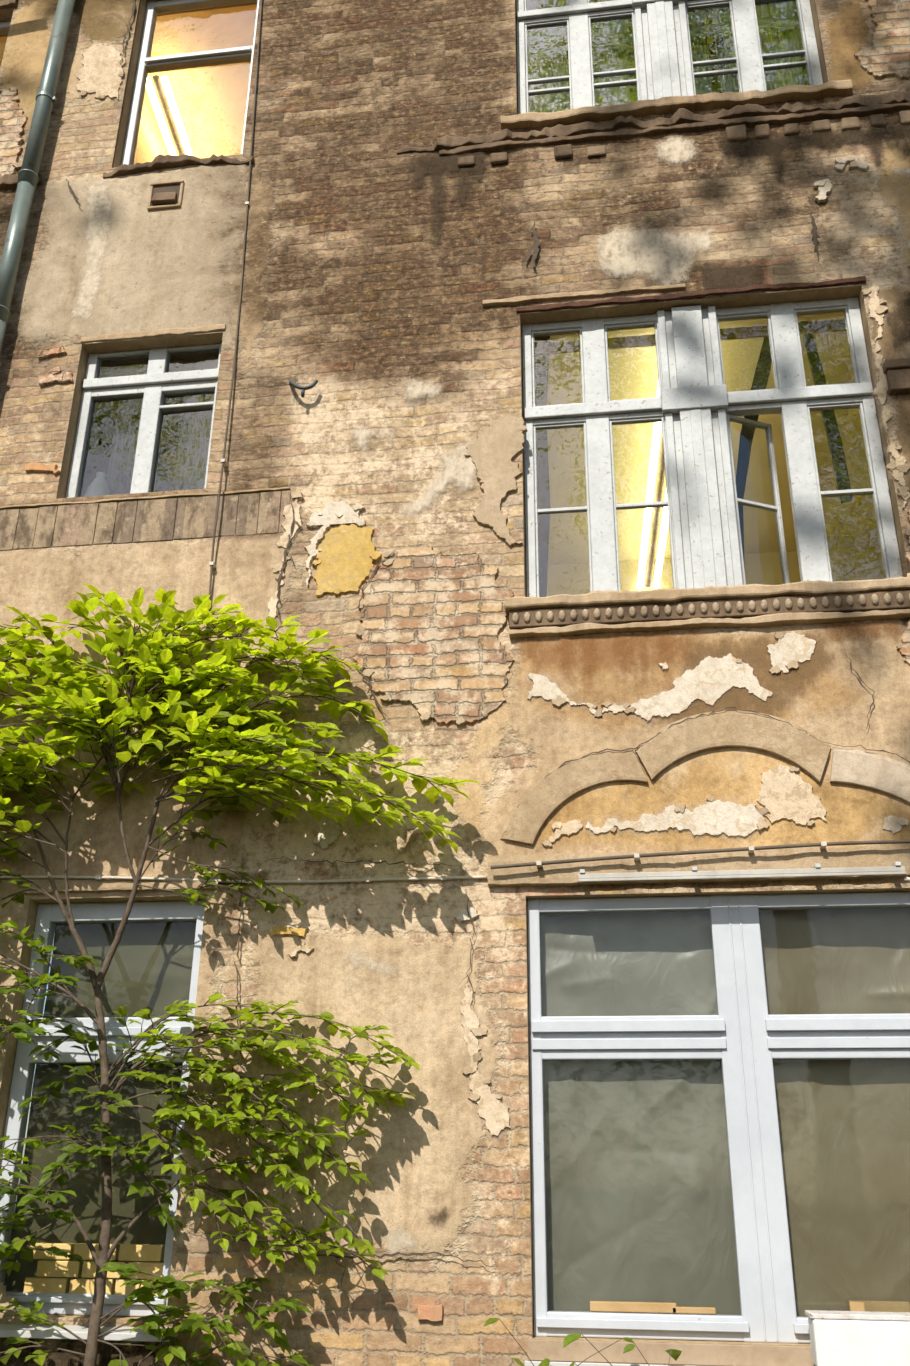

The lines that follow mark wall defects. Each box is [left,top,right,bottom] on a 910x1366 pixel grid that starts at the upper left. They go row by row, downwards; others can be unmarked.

spalling [854,0,910,80]
spalling [0,87,28,178]
damp [409,151,483,242]
flaking render [813,155,869,203]
damp [887,294,910,347]
flaking render [860,285,910,578]
flaking render [267,492,366,619]
spalling [353,544,515,726]
flaking render [527,631,817,722]
crack [545,649,910,777]
flaking render [542,763,827,848]
flaking render [460,985,511,1137]